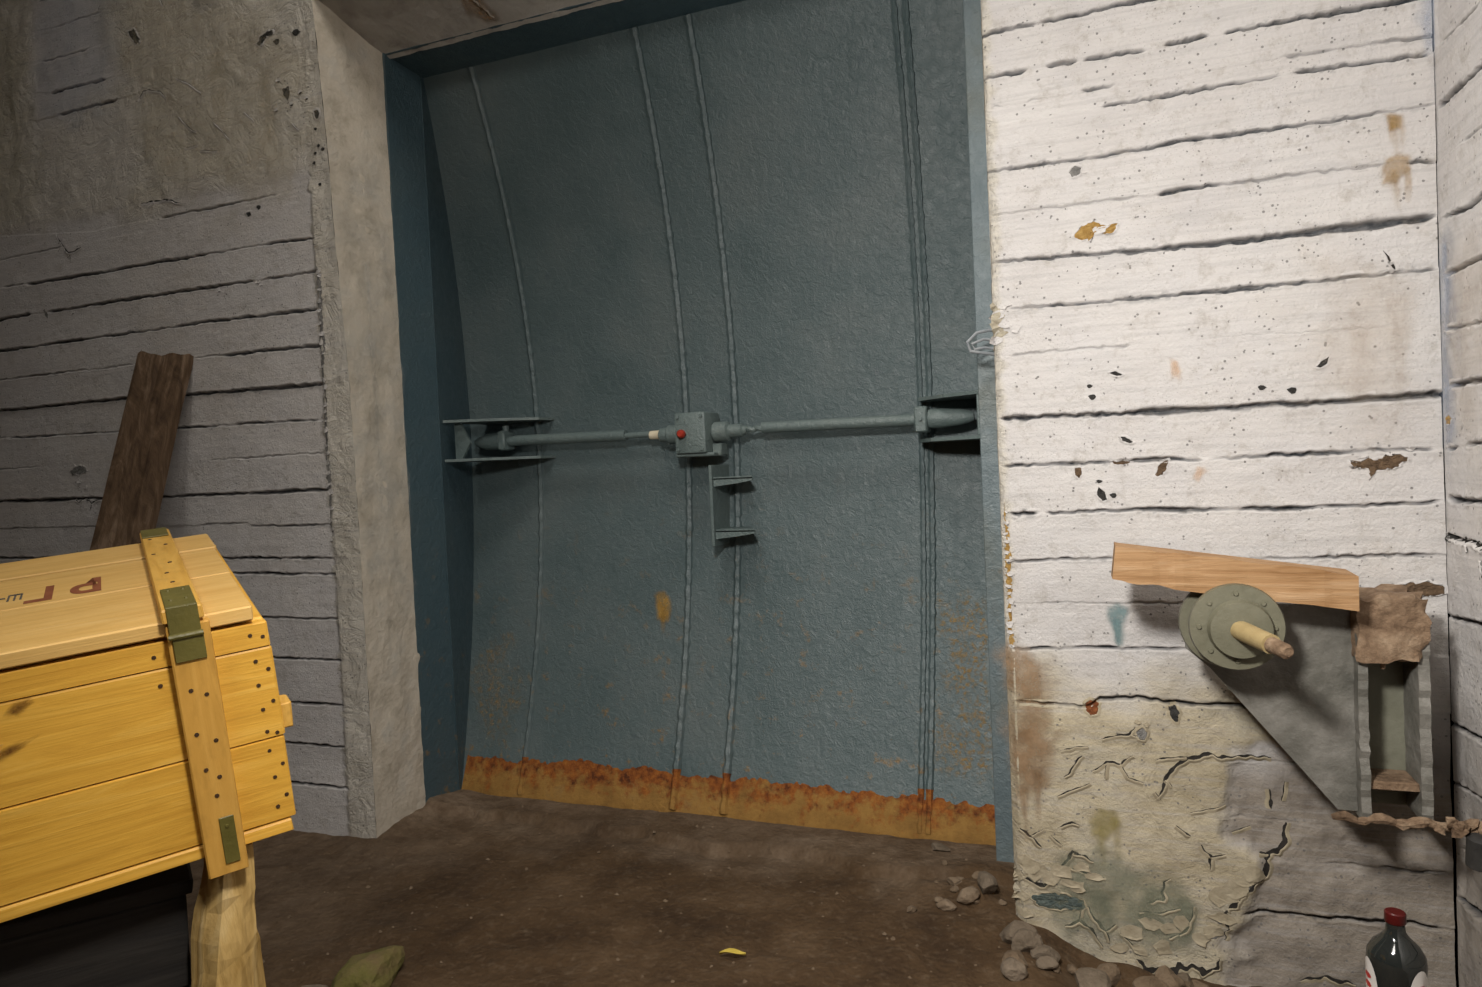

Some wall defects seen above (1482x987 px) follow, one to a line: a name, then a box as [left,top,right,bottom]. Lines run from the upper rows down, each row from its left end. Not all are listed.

spalling [1071,218,1121,244]
spalling [1347,444,1416,481]
rust [657,593,669,620]
spalling [1082,697,1102,719]
spalling [1166,700,1183,725]
spalling [1134,720,1151,743]
rust [461,755,996,846]
crack [1018,727,1292,980]
peeling [1011,855,1104,927]
peeling [1110,866,1266,957]
crack [1300,975,1356,987]